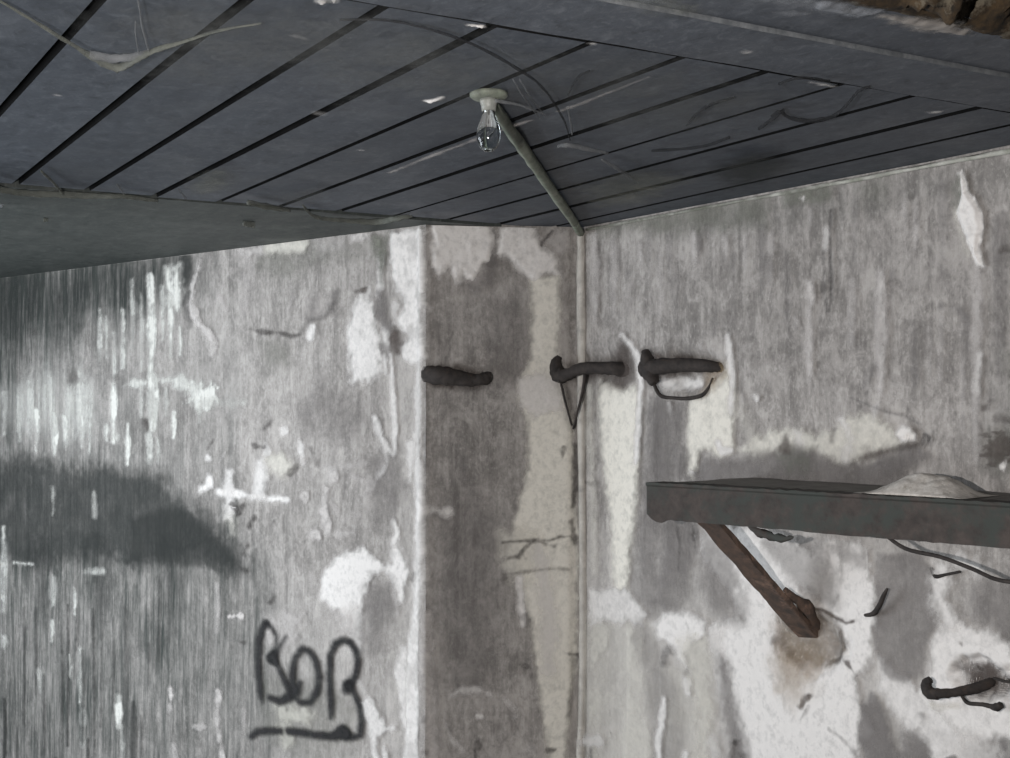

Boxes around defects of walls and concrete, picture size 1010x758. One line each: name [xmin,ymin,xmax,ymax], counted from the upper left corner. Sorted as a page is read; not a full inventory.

spalling [774,0,1010,39]